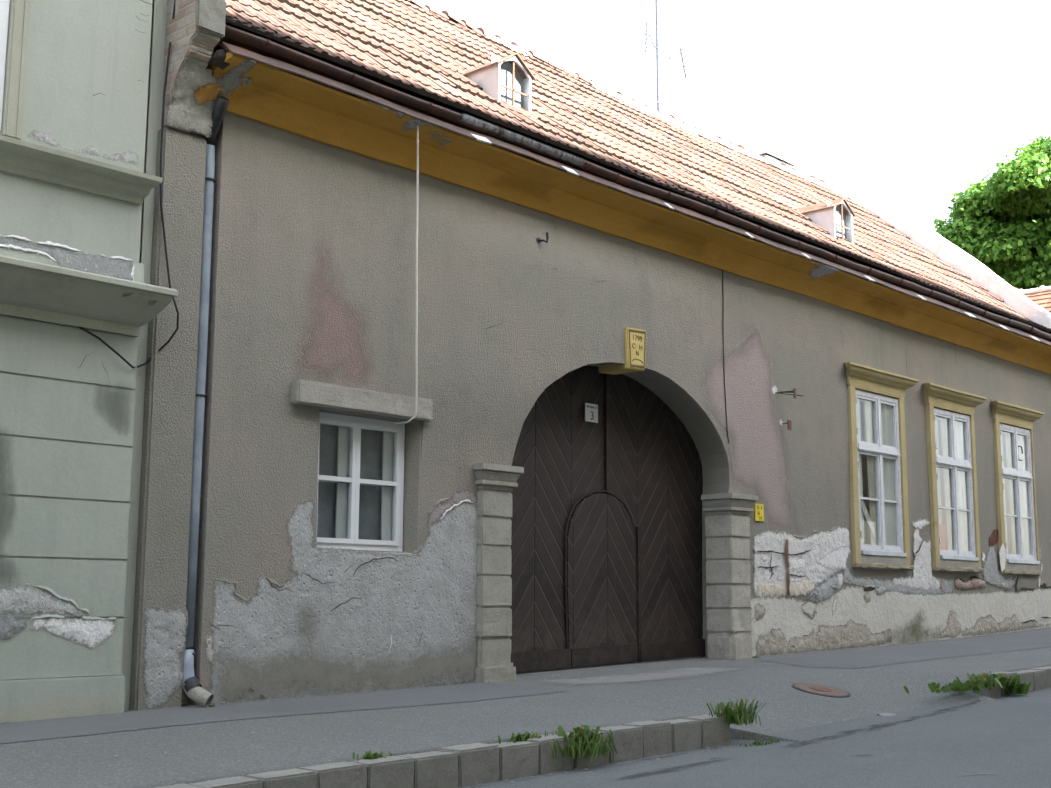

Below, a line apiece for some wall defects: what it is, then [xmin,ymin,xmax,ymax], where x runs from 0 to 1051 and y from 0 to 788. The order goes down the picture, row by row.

spalling [168,49,257,137]
spalling [0,235,134,297]
peeling [0,583,117,648]
spalling [142,608,188,708]
peeling [205,488,478,704]
spalling [753,518,1051,656]